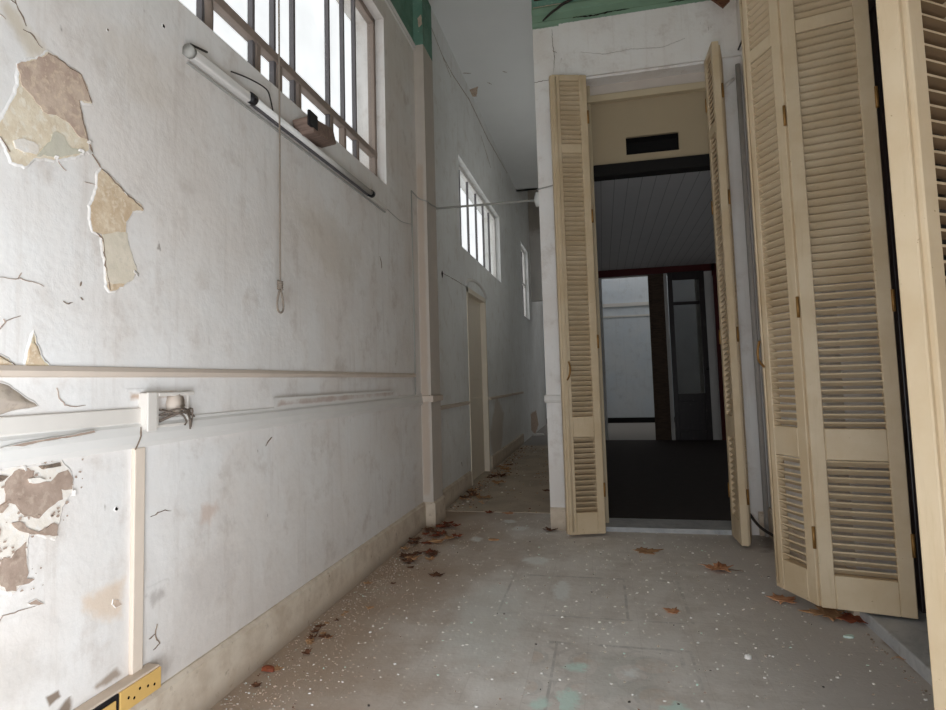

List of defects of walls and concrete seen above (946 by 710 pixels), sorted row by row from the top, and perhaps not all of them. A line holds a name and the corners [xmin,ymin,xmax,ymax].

peeling [0,50,94,169]
peeling [87,167,144,293]
peeling [0,330,51,366]
flaking render [0,458,84,606]